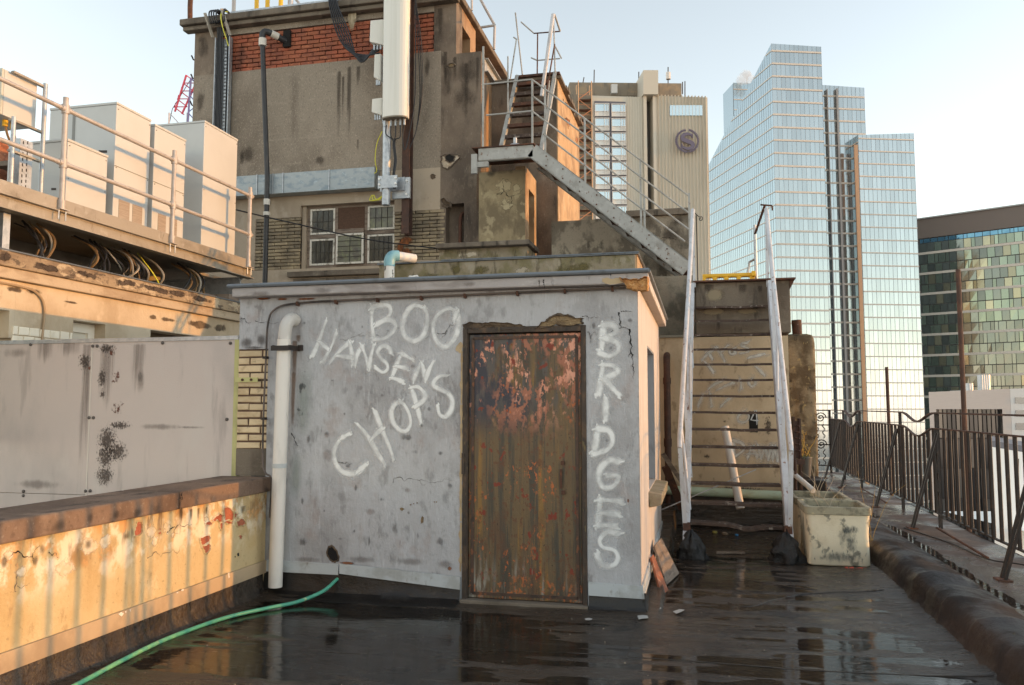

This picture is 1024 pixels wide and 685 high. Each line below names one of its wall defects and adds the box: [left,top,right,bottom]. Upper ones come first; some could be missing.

spalling [601,276,649,292]
leakage [190,321,226,331]
spalling [463,313,584,331]
crack [582,311,634,379]
mould [78,355,119,397]
mould [96,403,130,485]
spalling [133,519,143,538]
spalling [199,506,246,555]
leakage [81,534,111,555]